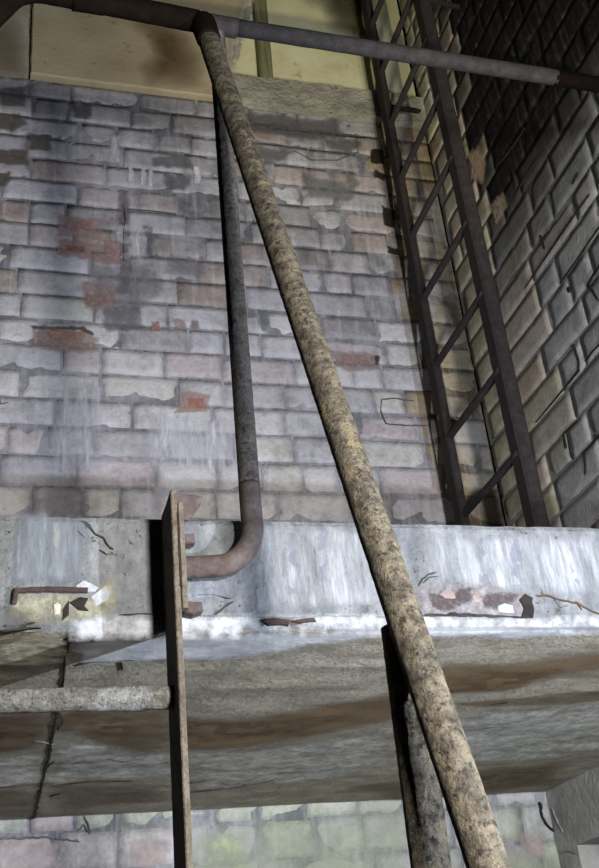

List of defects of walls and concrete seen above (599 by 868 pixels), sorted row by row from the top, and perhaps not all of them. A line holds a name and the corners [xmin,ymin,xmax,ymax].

peeling [469,148,485,181]
peeling [493,194,506,223]
peeling [58,240,123,264]
peeling [31,326,97,351]
peeling [177,392,208,412]
spalling [418,584,534,619]
crack [536,594,599,615]
crack [62,634,135,687]
crack [0,712,92,843]